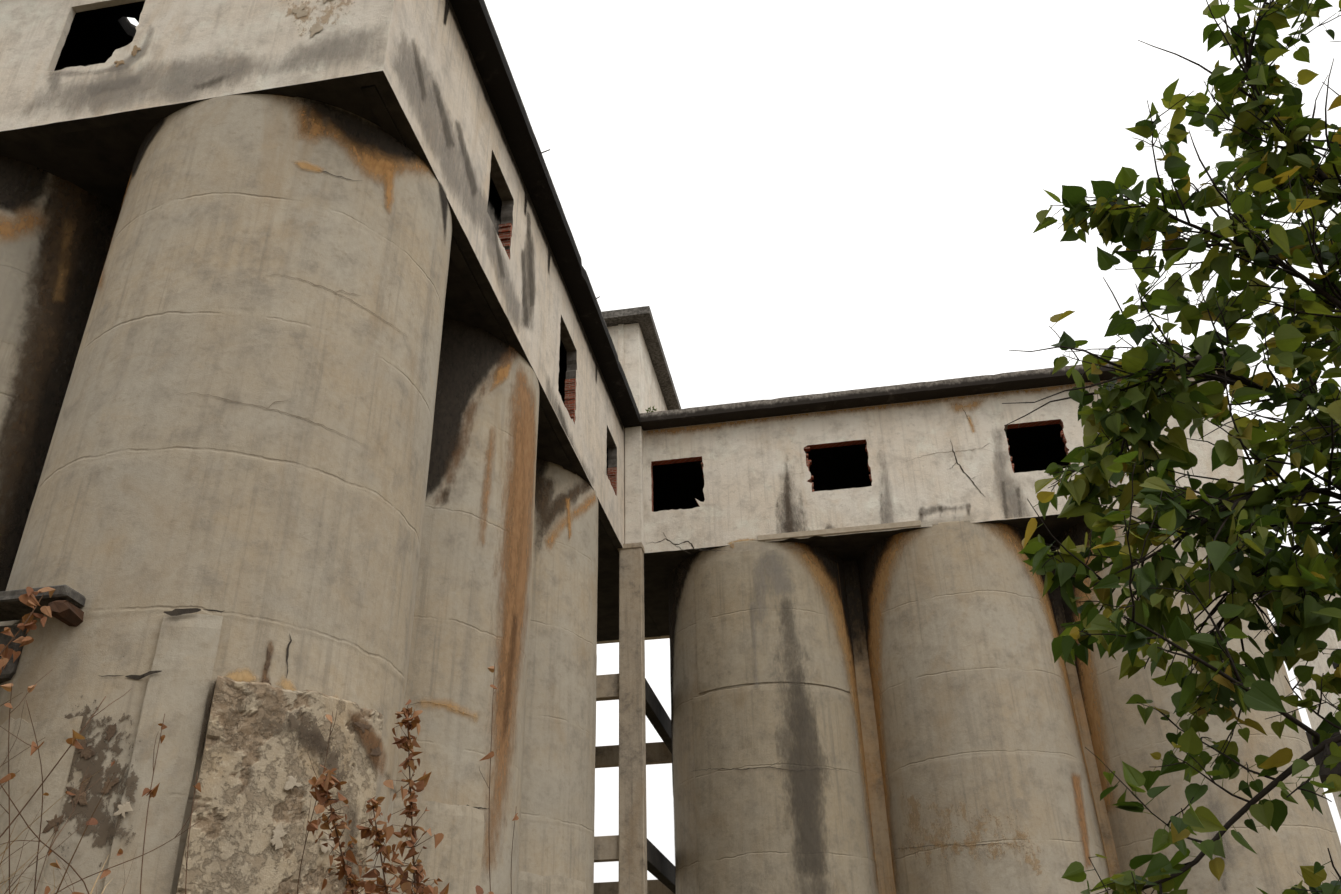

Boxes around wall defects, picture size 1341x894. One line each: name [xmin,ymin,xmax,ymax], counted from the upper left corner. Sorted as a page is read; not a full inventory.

peeling [292,5,323,37]
damp [66,60,249,108]
corrosion [299,110,423,179]
damp [397,0,623,430]
damp [0,174,94,549]
corrosion [483,437,495,539]
crack [903,410,993,494]
corrosion [485,346,596,865]
spalling [352,713,396,793]
damp [752,556,826,894]